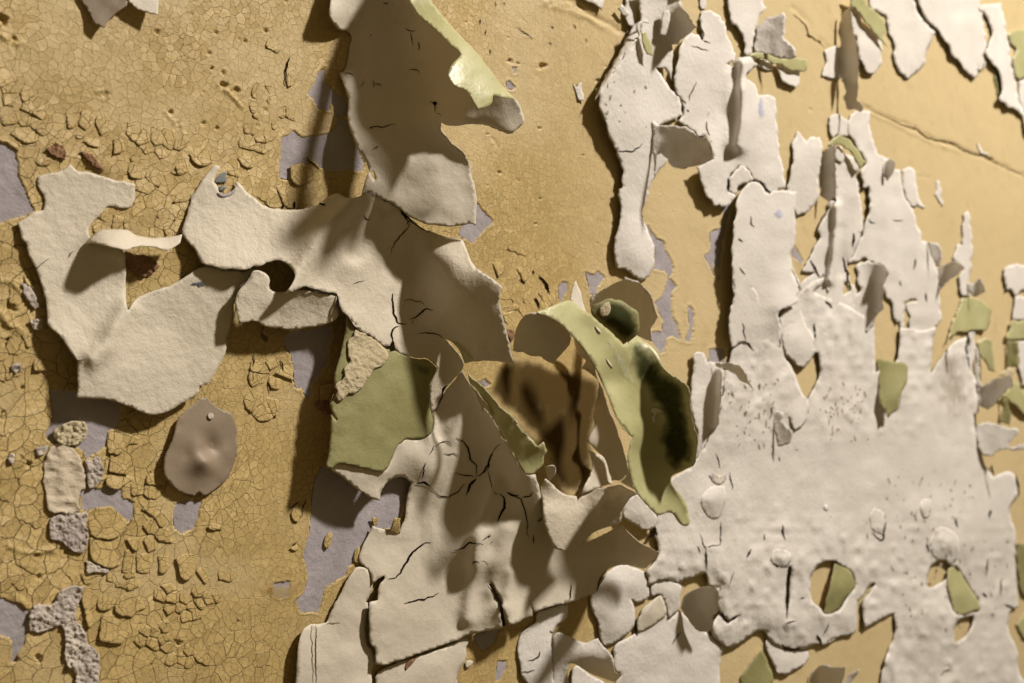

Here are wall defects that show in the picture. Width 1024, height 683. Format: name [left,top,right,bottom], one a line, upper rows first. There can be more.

crack [864,106,1024,176]
peeling [0,0,524,591]
peeling [295,0,1024,683]
spalling [0,585,146,683]
peeling [134,553,221,669]
crack [311,622,339,682]